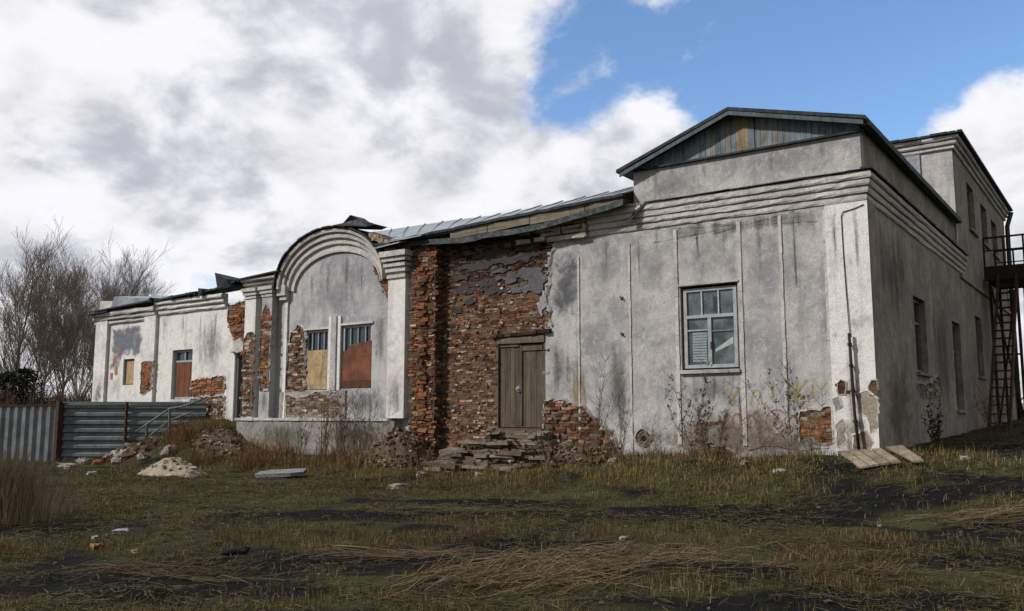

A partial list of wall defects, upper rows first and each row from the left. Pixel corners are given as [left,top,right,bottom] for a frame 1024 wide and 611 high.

flaking render [110,327,155,395]
flaking render [189,374,226,420]
flaking render [227,299,273,417]
flaking render [285,322,344,418]
corrosion [342,341,372,381]
flaking render [407,244,548,455]
peeling [795,379,882,450]